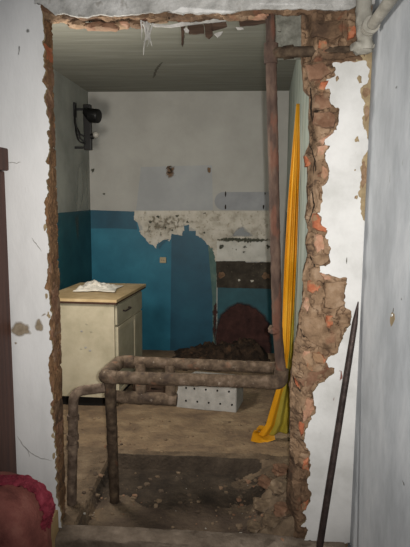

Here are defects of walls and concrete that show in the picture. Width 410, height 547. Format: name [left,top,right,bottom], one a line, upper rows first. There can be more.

spalling [39,3,372,538]